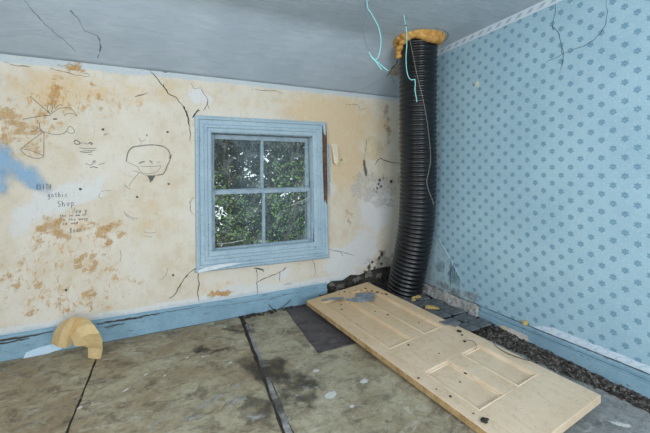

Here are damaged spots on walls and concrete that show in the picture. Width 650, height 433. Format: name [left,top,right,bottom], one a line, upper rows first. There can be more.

crack [25,1,90,77]
crack [545,4,608,73]
crack [151,72,210,137]
crack [169,268,200,299]